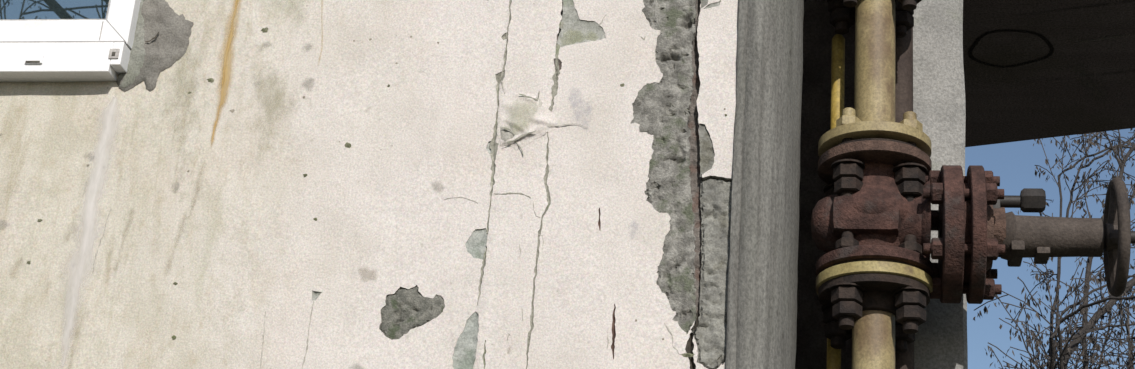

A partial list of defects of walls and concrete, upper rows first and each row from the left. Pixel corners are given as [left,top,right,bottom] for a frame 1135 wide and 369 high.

peeling [557,0,606,47]
rust [212,0,239,141]
peeling [497,89,588,155]
crack [444,0,564,369]
spalling [631,0,732,369]
peeling [465,228,488,260]
crack [302,291,322,369]
spalling [380,285,445,340]
peeling [452,312,479,369]
crack [665,310,699,369]